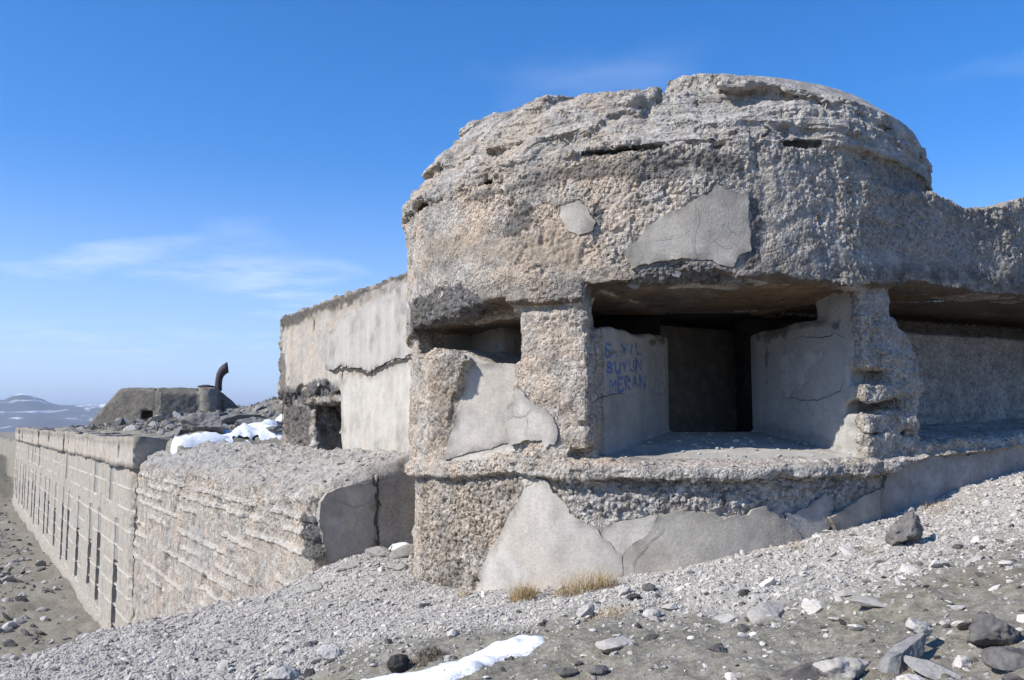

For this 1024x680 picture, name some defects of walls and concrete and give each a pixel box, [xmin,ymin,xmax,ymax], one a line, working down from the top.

crack [523,128,732,158]
crack [761,124,822,149]
crack [409,203,429,221]
crack [330,356,412,379]
peeling [286,282,503,454]
peeling [427,353,559,460]
crack [333,474,382,546]
peeling [418,446,1024,613]
peeling [732,598,811,658]
peeling [821,617,880,635]
peeling [932,600,964,640]